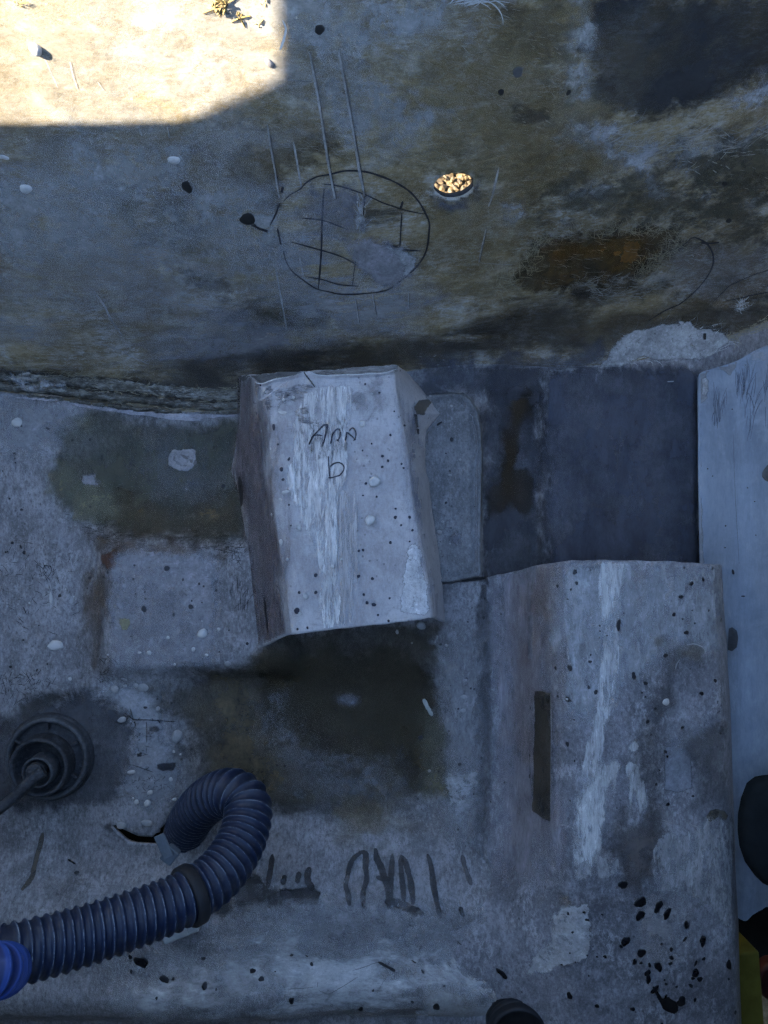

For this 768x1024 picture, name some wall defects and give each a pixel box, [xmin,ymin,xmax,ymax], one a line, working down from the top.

leakage [0,295,768,541]
peeling [541,312,768,374]
leakage [152,624,451,814]
peeling [527,903,592,974]